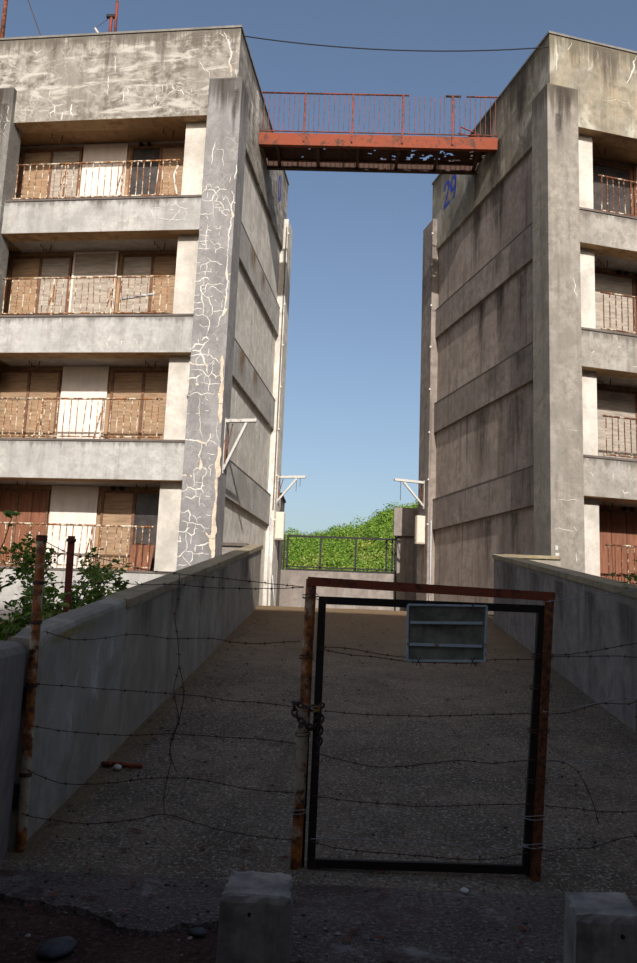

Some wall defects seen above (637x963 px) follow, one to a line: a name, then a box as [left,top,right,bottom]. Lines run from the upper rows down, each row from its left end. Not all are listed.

crack [107,33,237,108]
water stain [556,87,570,132]
crack [124,145,237,566]